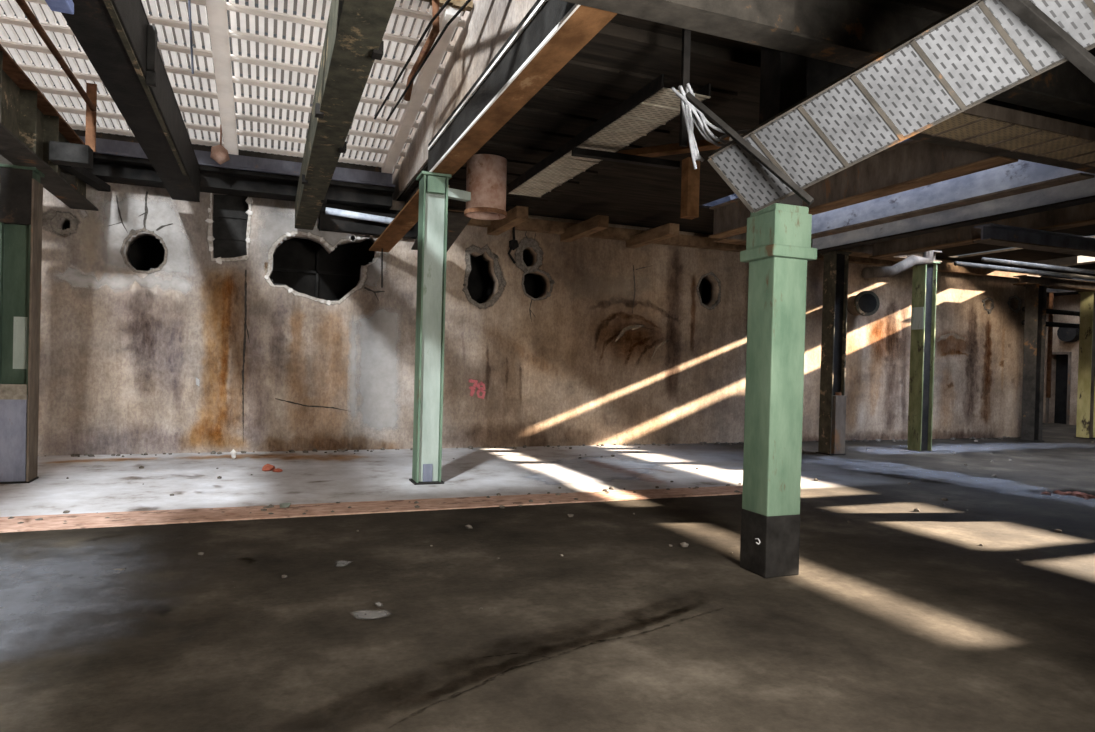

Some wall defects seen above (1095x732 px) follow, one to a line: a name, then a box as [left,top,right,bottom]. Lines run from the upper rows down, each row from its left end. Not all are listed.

peeling [59,199,189,290]
spalling [205,193,381,306]
hole [462,245,506,309]
hole [698,279,708,304]